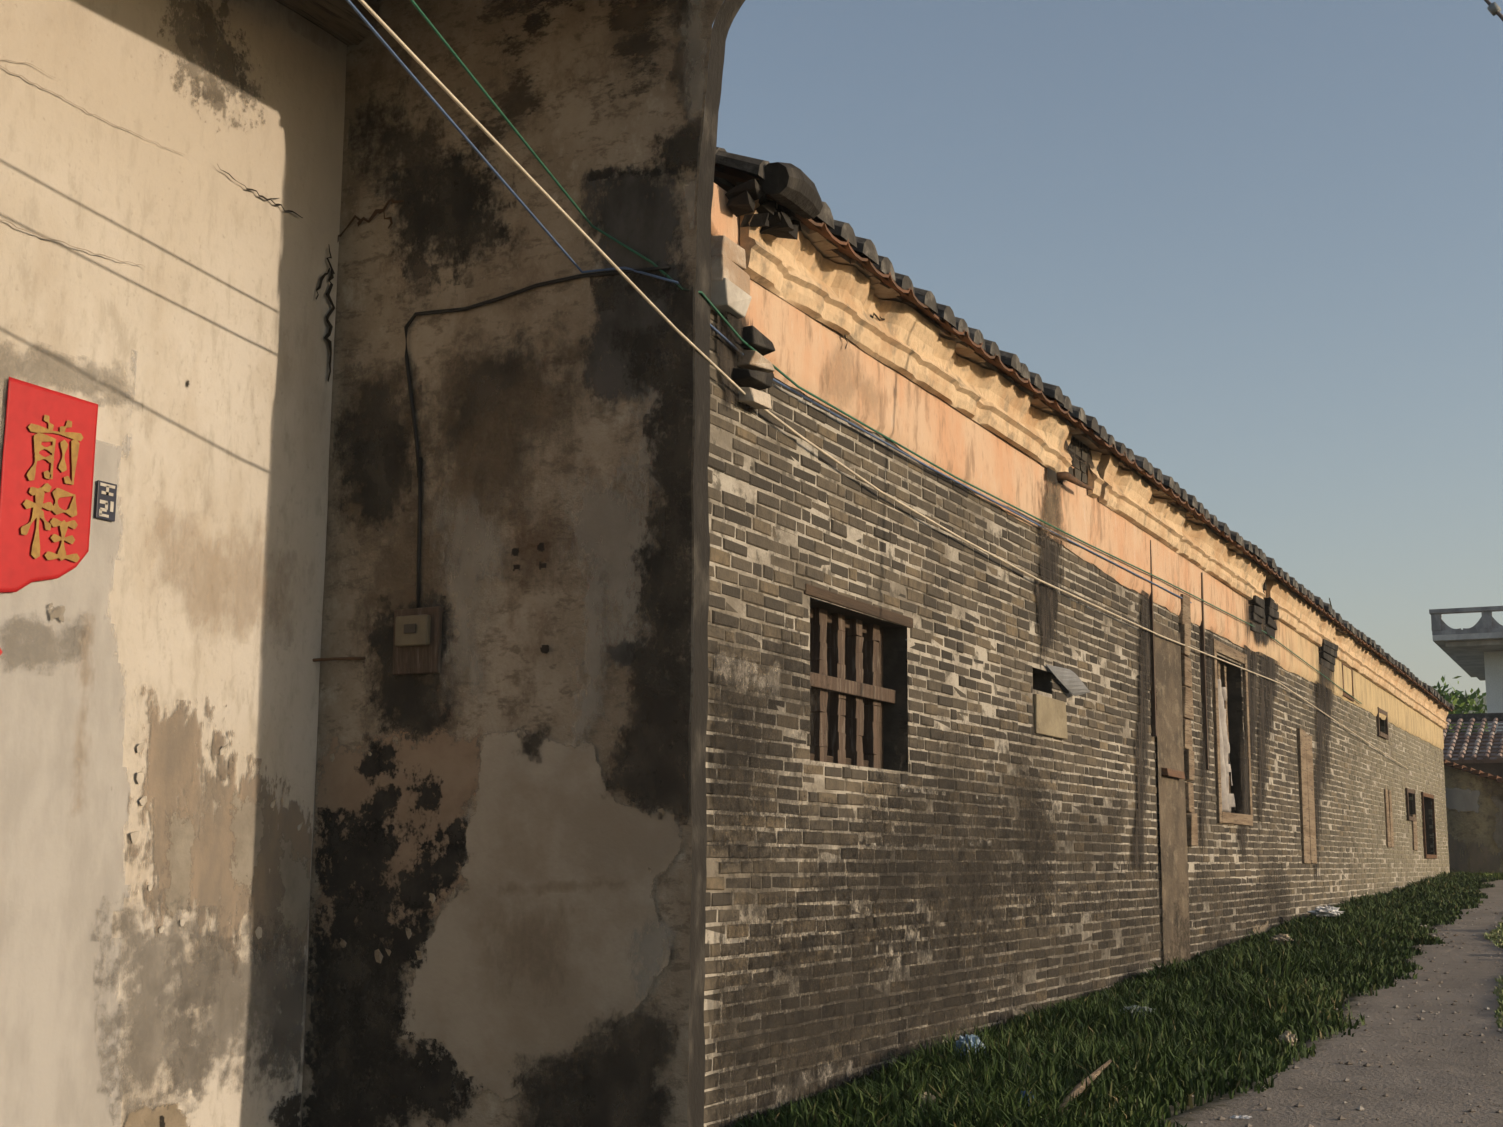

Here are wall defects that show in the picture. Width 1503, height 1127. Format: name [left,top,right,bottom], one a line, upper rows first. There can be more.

crack [0,60,303,218]
leakage [159,0,265,132]
leakage [348,0,707,297]
crack [316,198,404,382]
leakage [567,273,693,825]
peeling [126,687,481,972]
leakage [522,724,550,761]
leakage [97,891,483,1127]
leakage [514,1005,678,1127]